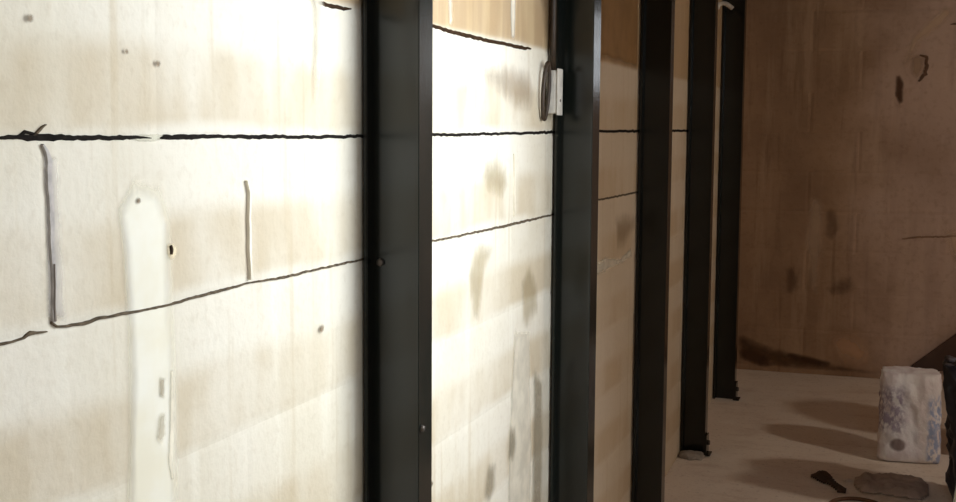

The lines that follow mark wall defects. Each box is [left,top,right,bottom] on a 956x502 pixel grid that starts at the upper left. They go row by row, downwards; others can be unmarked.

crack [433,24,531,50]
crack [432,129,555,137]
crack [599,127,639,135]
crack [598,191,638,201]
crack [0,124,364,346]
crack [432,213,554,242]
leakage [740,338,828,367]